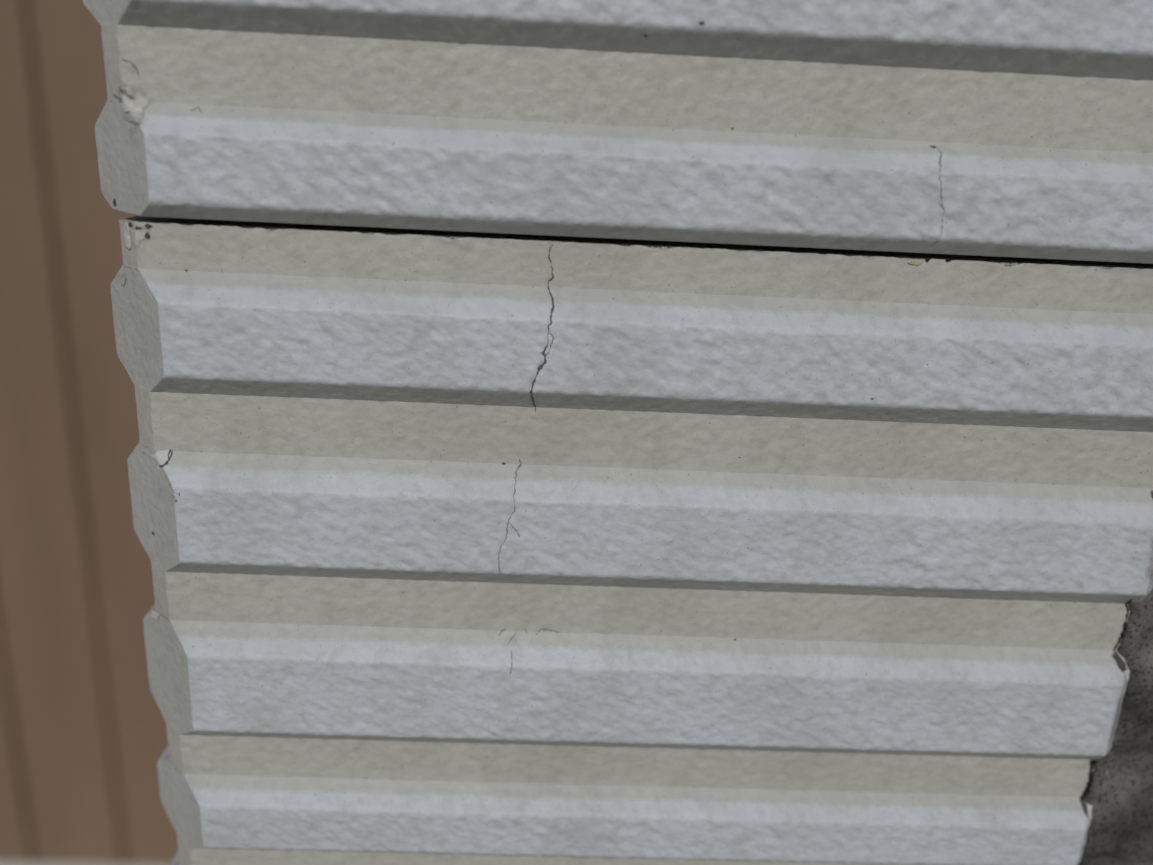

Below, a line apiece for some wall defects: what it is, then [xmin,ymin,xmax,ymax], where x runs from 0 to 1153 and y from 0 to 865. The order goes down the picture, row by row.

crack [530,245,555,412]
crack [498,455,522,572]
crack [498,628,559,674]
peeling [1112,652,1130,681]
peeling [1080,796,1093,820]